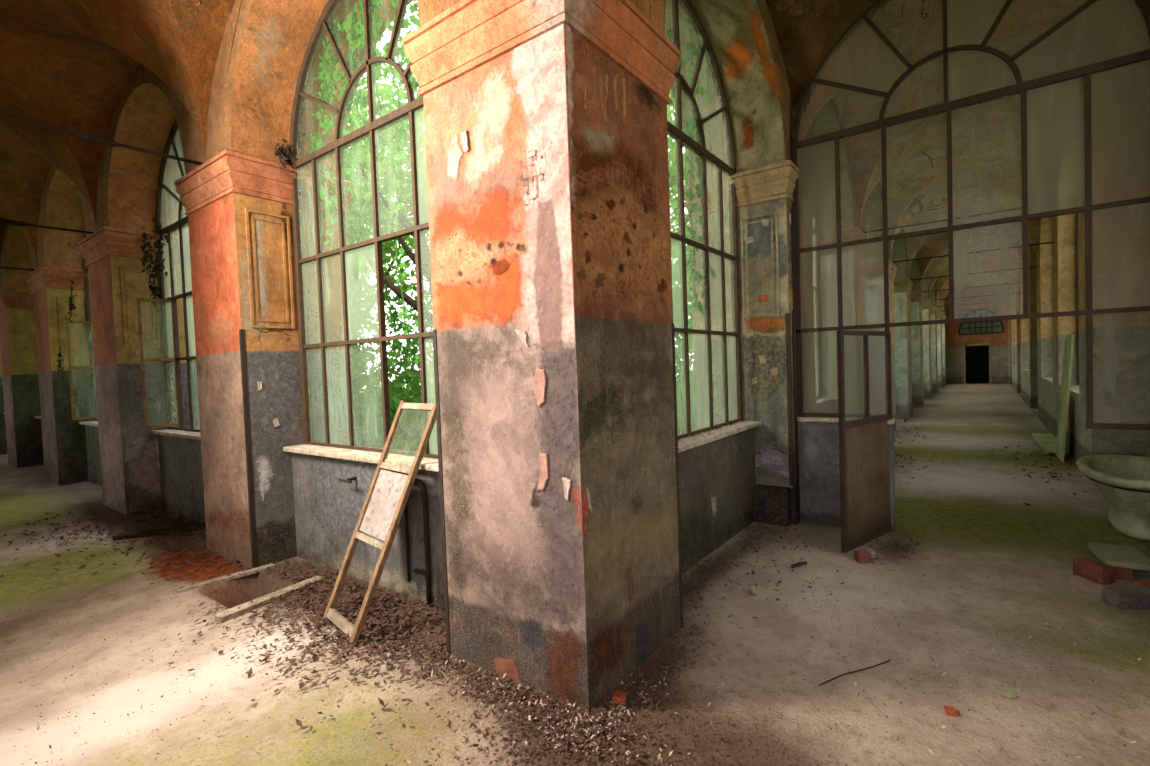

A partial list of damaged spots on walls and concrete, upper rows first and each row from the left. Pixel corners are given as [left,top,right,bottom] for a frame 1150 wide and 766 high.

peeling [743,193,793,284]
flaking render [434,24,671,624]
peeling [744,335,786,401]